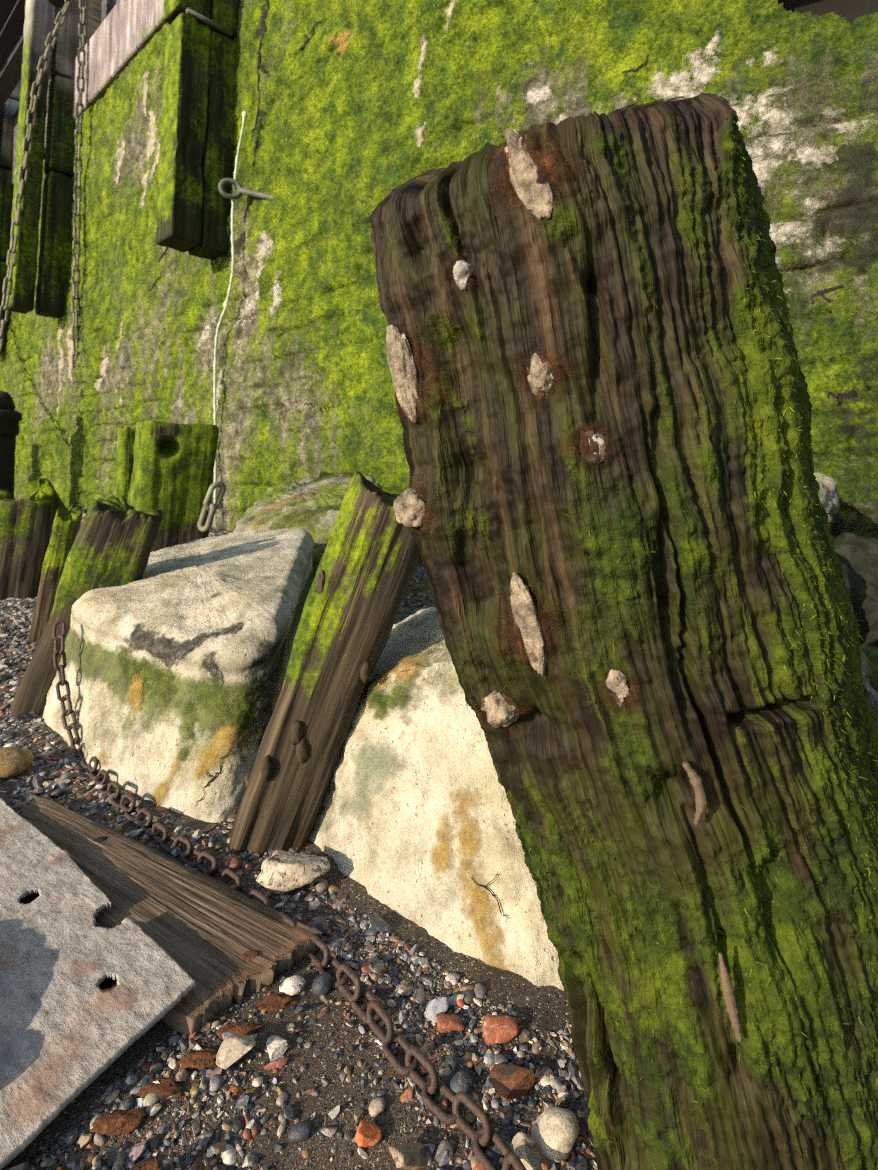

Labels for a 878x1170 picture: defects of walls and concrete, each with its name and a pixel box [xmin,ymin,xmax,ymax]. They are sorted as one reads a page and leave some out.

water stain [813,143,878,273]
water stain [822,395,878,452]
rust [128,676,142,708]
rust [367,655,422,691]
rust [195,726,248,778]
rust [154,753,179,806]
rust [432,793,501,969]